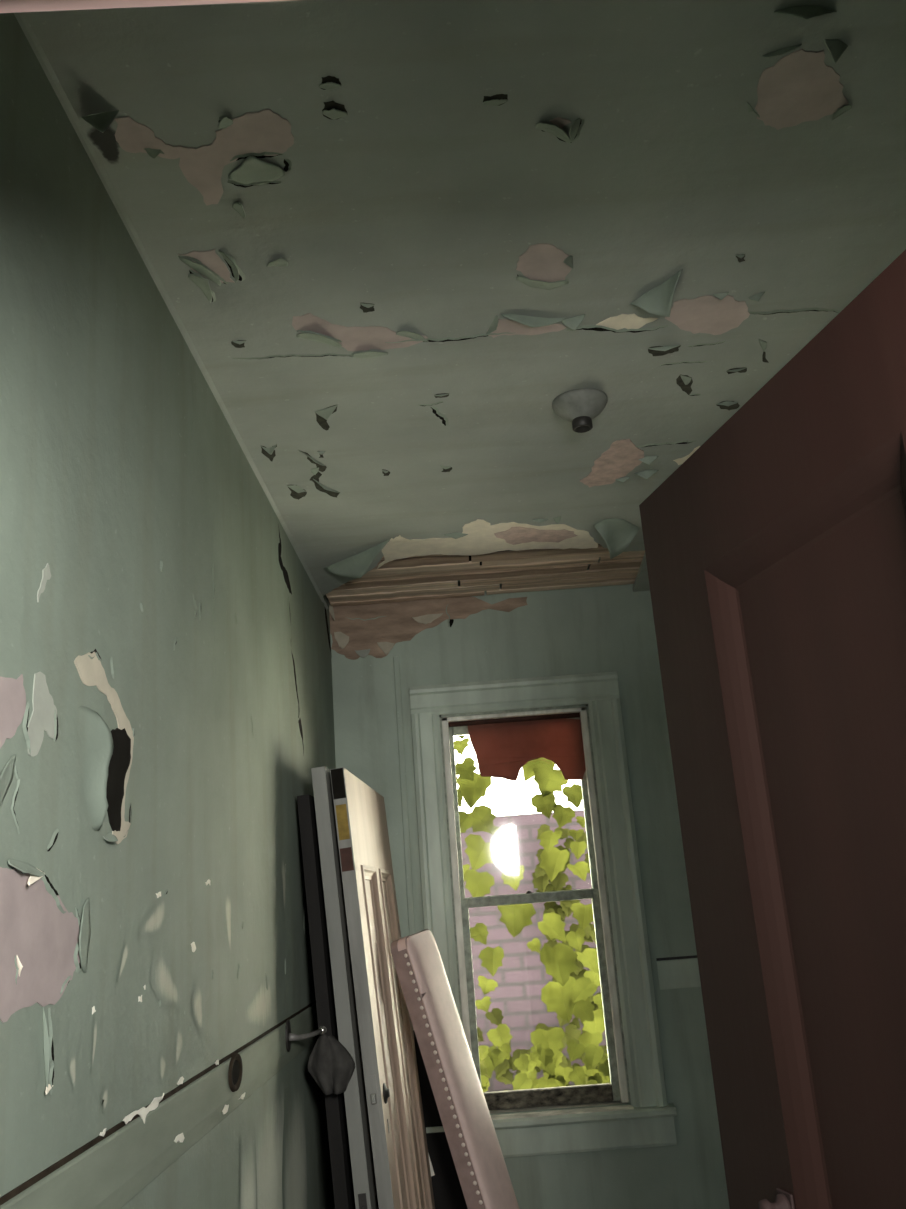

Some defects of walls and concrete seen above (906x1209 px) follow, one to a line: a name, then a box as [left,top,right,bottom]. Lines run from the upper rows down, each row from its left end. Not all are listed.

peeling [747,39,852,130]
peeling [81,109,294,219]
peeling [178,249,245,303]
crack [232,269,841,359]
peeling [648,341,725,396]
peeling [315,405,337,431]
peeling [418,393,450,426]
peeling [287,450,341,500]
peeling [580,439,700,487]
flaking render [329,596,528,660]
peeling [0,672,58,834]
peeling [0,858,91,1095]